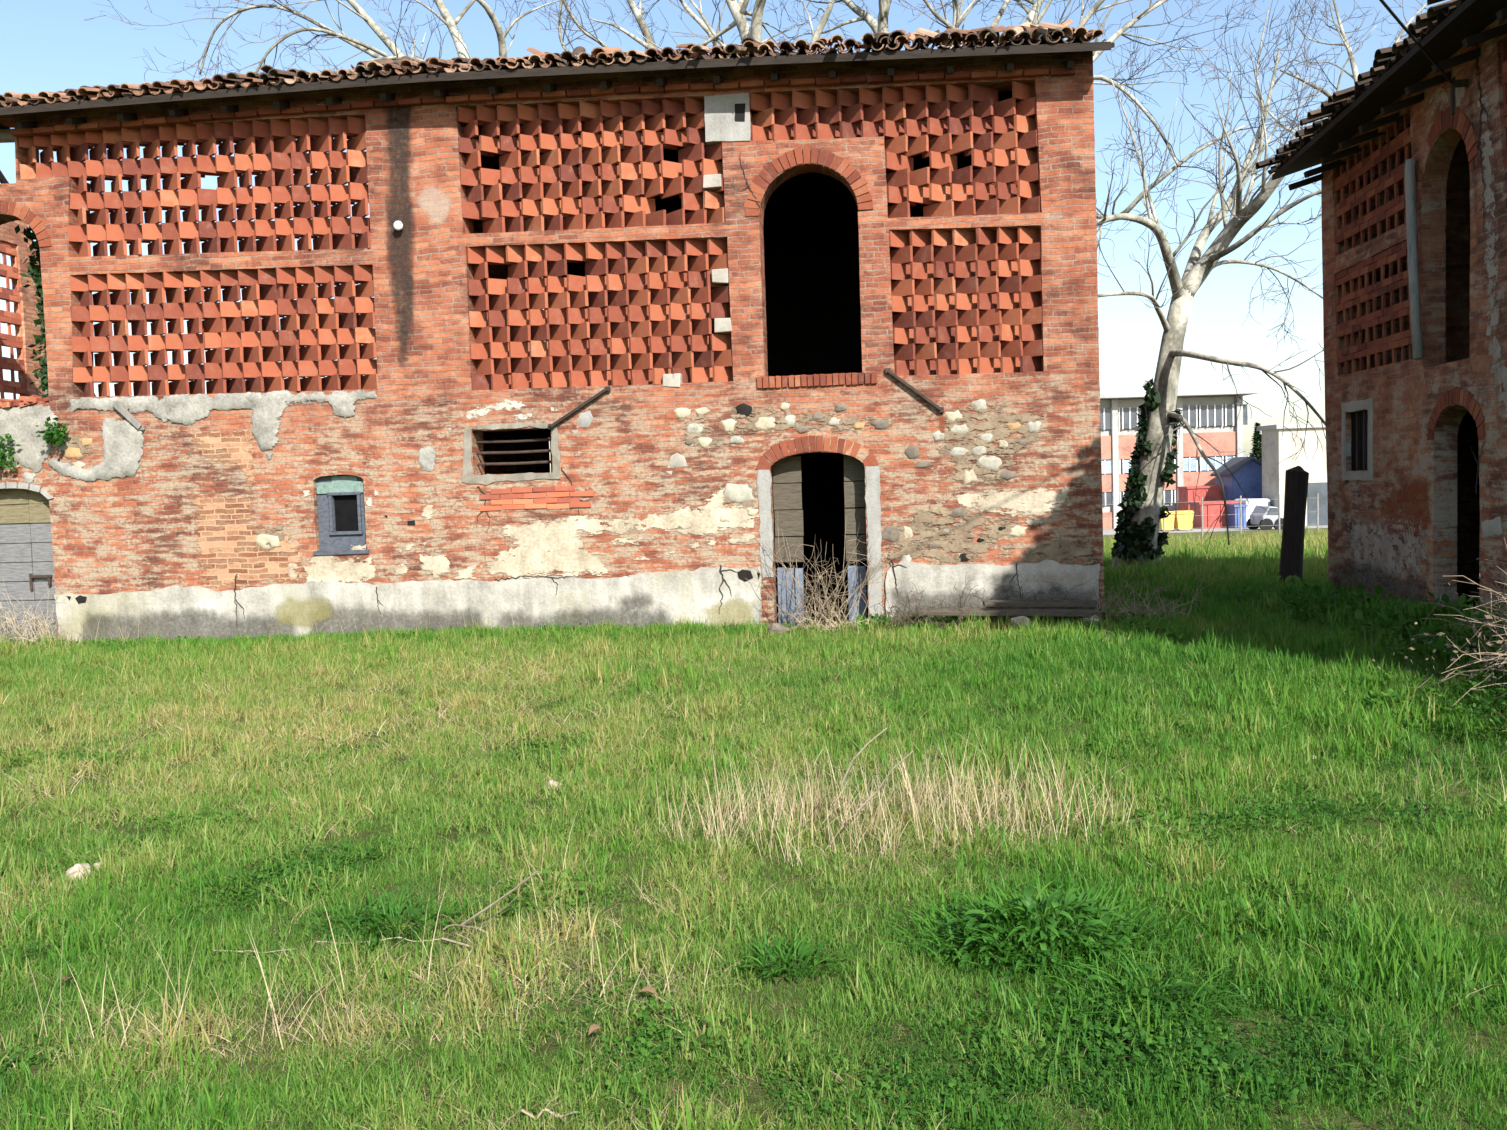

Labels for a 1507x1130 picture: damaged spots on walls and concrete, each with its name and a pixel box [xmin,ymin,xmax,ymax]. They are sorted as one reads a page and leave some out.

water stain [387,105,413,354]
peeling [0,389,377,483]
peeling [611,520,756,560]
crack [719,565,736,613]